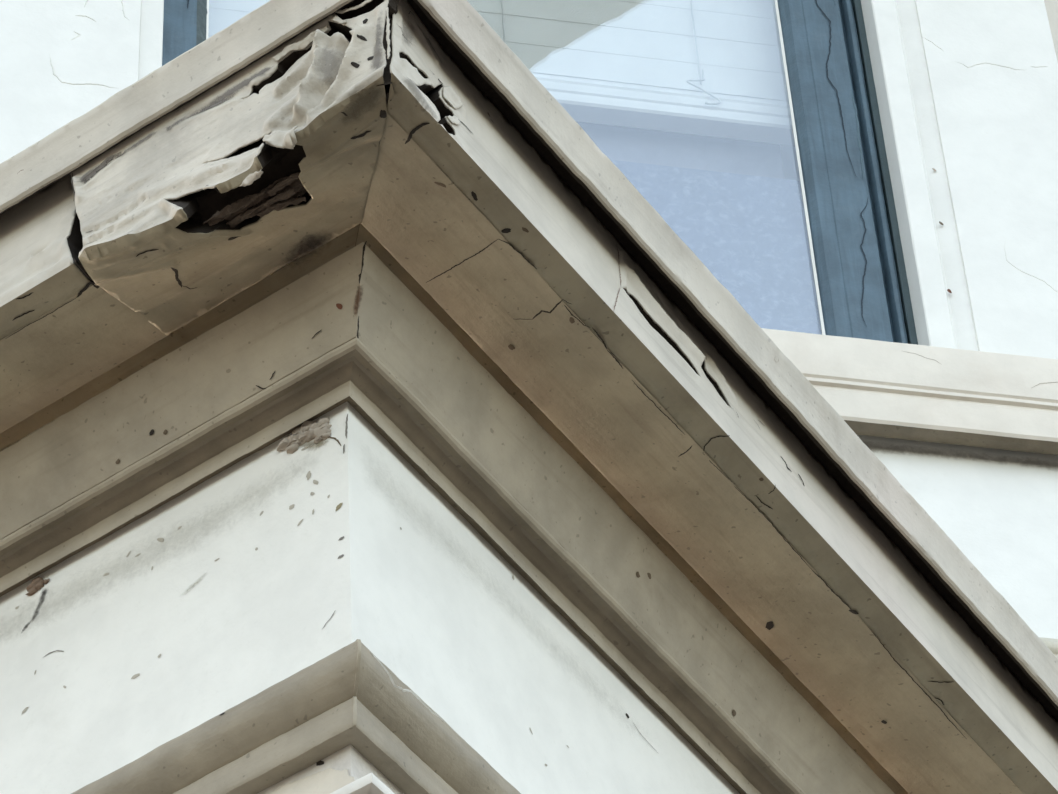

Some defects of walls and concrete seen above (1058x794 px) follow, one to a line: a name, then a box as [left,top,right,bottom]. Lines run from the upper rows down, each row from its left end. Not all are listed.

crack [71,0,96,40]
peeling [273,0,372,61]
crack [50,56,114,88]
crack [923,37,1048,70]
peeling [443,86,463,125]
peeling [262,126,298,149]
peeling [240,170,263,187]
crack [499,239,536,269]
crack [7,230,101,338]
crack [523,299,965,737]